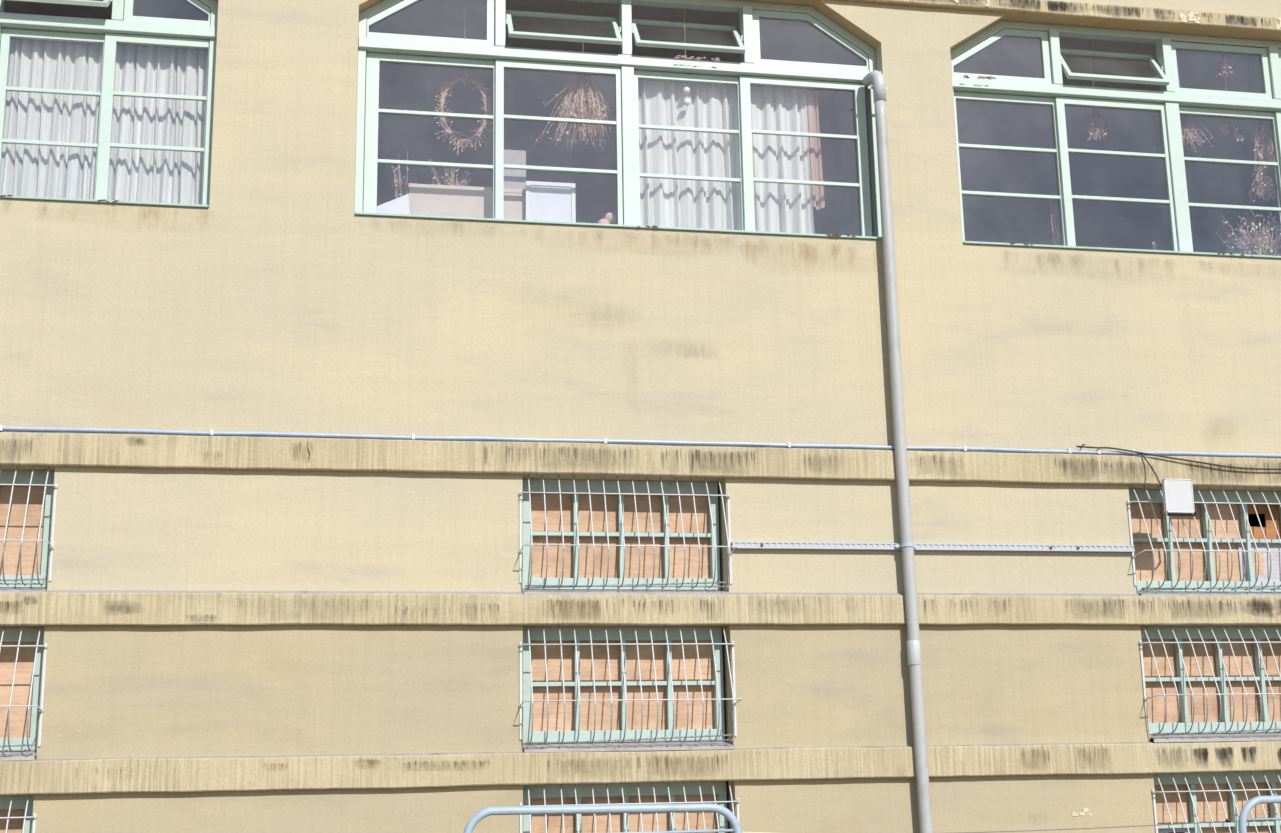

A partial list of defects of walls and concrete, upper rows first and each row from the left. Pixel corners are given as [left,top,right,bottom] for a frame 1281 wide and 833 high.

damp [1013,0,1071,10]